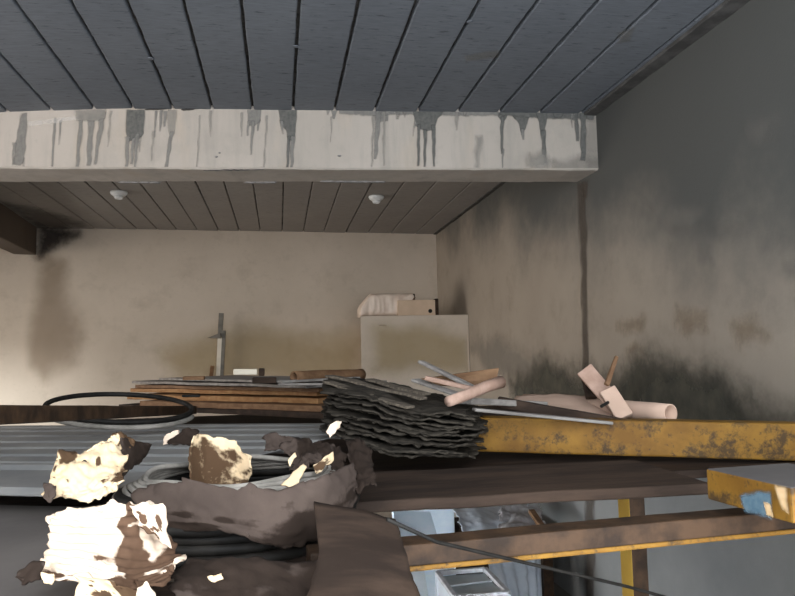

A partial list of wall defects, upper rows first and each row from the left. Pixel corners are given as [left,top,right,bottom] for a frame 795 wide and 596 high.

leakage [12,113,27,165]
leakage [52,118,62,167]
leakage [76,110,111,167]
leakage [125,109,145,167]
leakage [151,110,176,167]
leakage [241,109,267,164]
leakage [279,110,297,167]
leakage [372,111,442,167]
leakage [498,113,586,167]
leakage [511,359,585,397]
leakage [610,358,785,421]